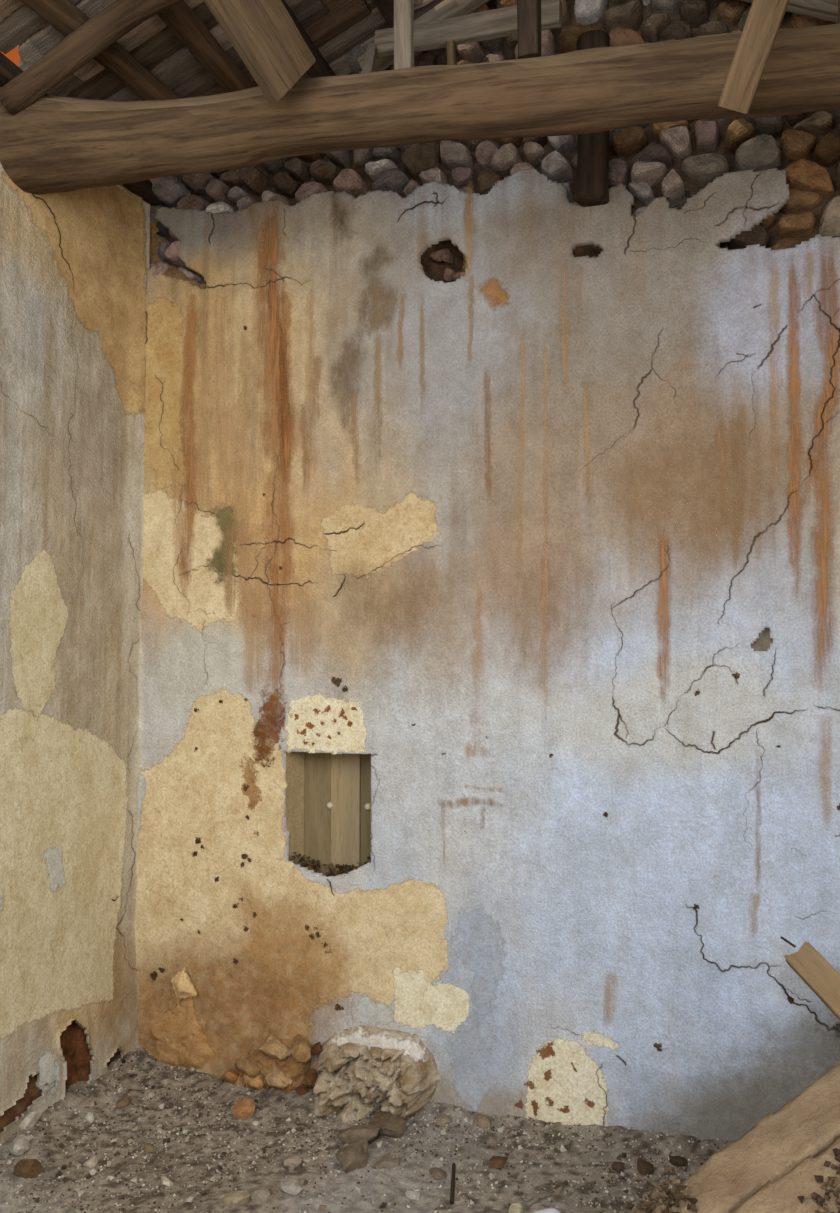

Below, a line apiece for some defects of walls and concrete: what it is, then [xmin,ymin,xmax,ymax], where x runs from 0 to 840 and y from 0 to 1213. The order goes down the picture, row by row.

flaking render [553,1,609,55]
flaking render [608,109,840,250]
flaking render [779,12,794,29]
rust [240,216,294,809]
flaking render [1,135,578,632]
crack [611,281,840,804]
rust [788,265,840,667]
peeling [0,549,471,1132]
peeling [514,1029,619,1126]
crack [686,906,829,1030]